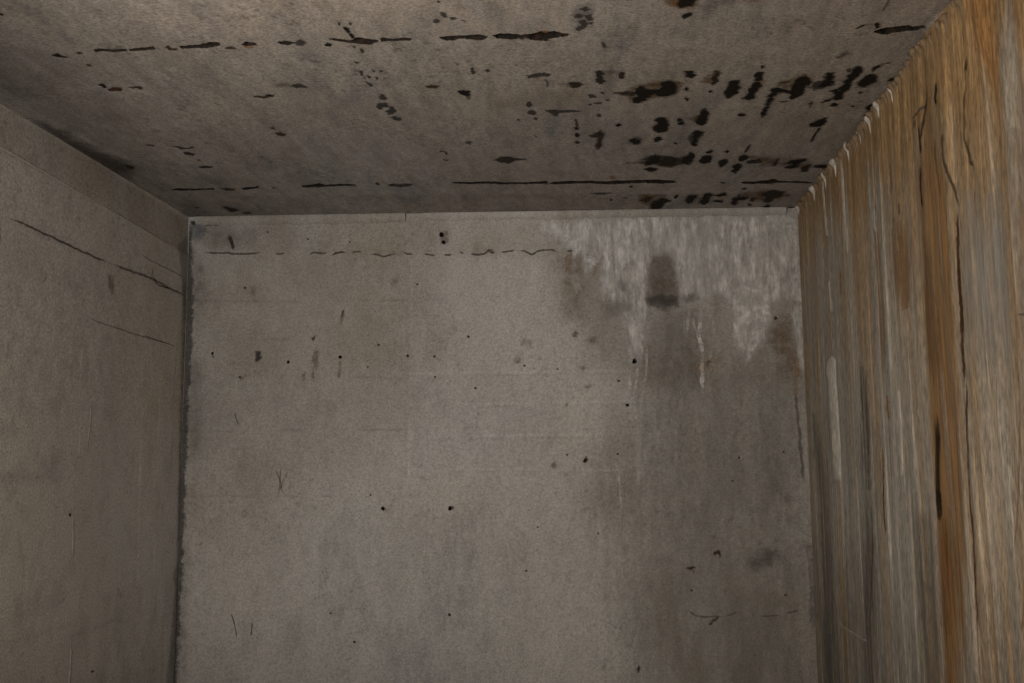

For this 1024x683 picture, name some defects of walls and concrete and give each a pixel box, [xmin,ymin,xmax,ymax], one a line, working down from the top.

spalling [856,23,928,36]
spalling [720,178,815,190]
damp [540,0,962,419]
crack [16,220,102,260]
crack [209,249,284,257]
crack [310,249,573,257]